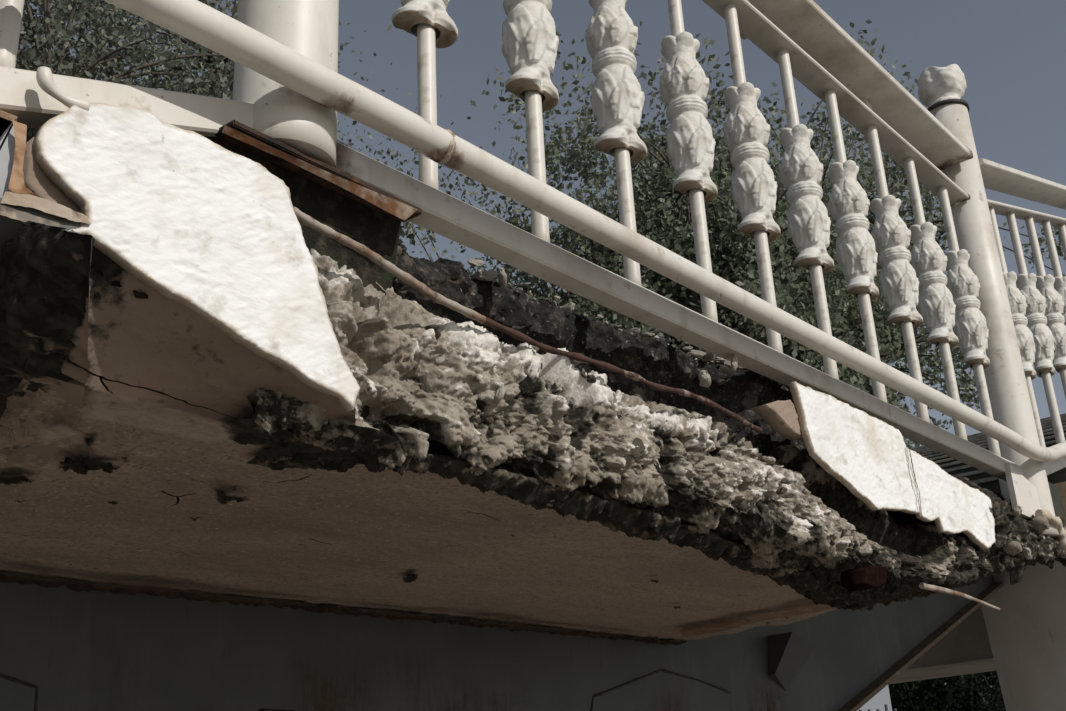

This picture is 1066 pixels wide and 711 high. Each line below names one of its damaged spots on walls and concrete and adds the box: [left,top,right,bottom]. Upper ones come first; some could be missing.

rust [336,141,348,169]
crack [48,351,240,421]
spalling [220,206,1066,611]
spalling [0,474,34,485]
spalling [214,487,247,504]